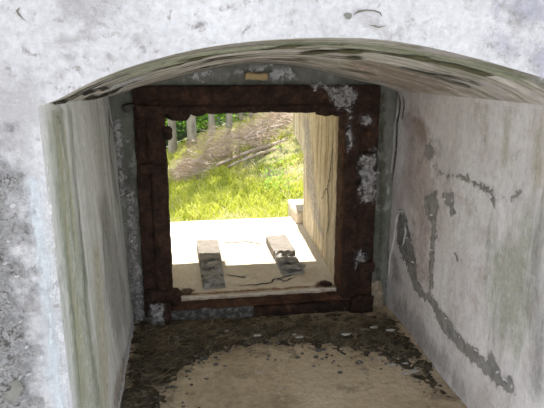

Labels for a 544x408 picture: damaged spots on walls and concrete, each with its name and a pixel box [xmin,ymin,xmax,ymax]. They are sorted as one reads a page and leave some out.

damp [270,66,295,80]
damp [357,154,380,203]
crack [429,158,495,208]
corrosion [181,280,335,295]
crack [226,274,295,286]